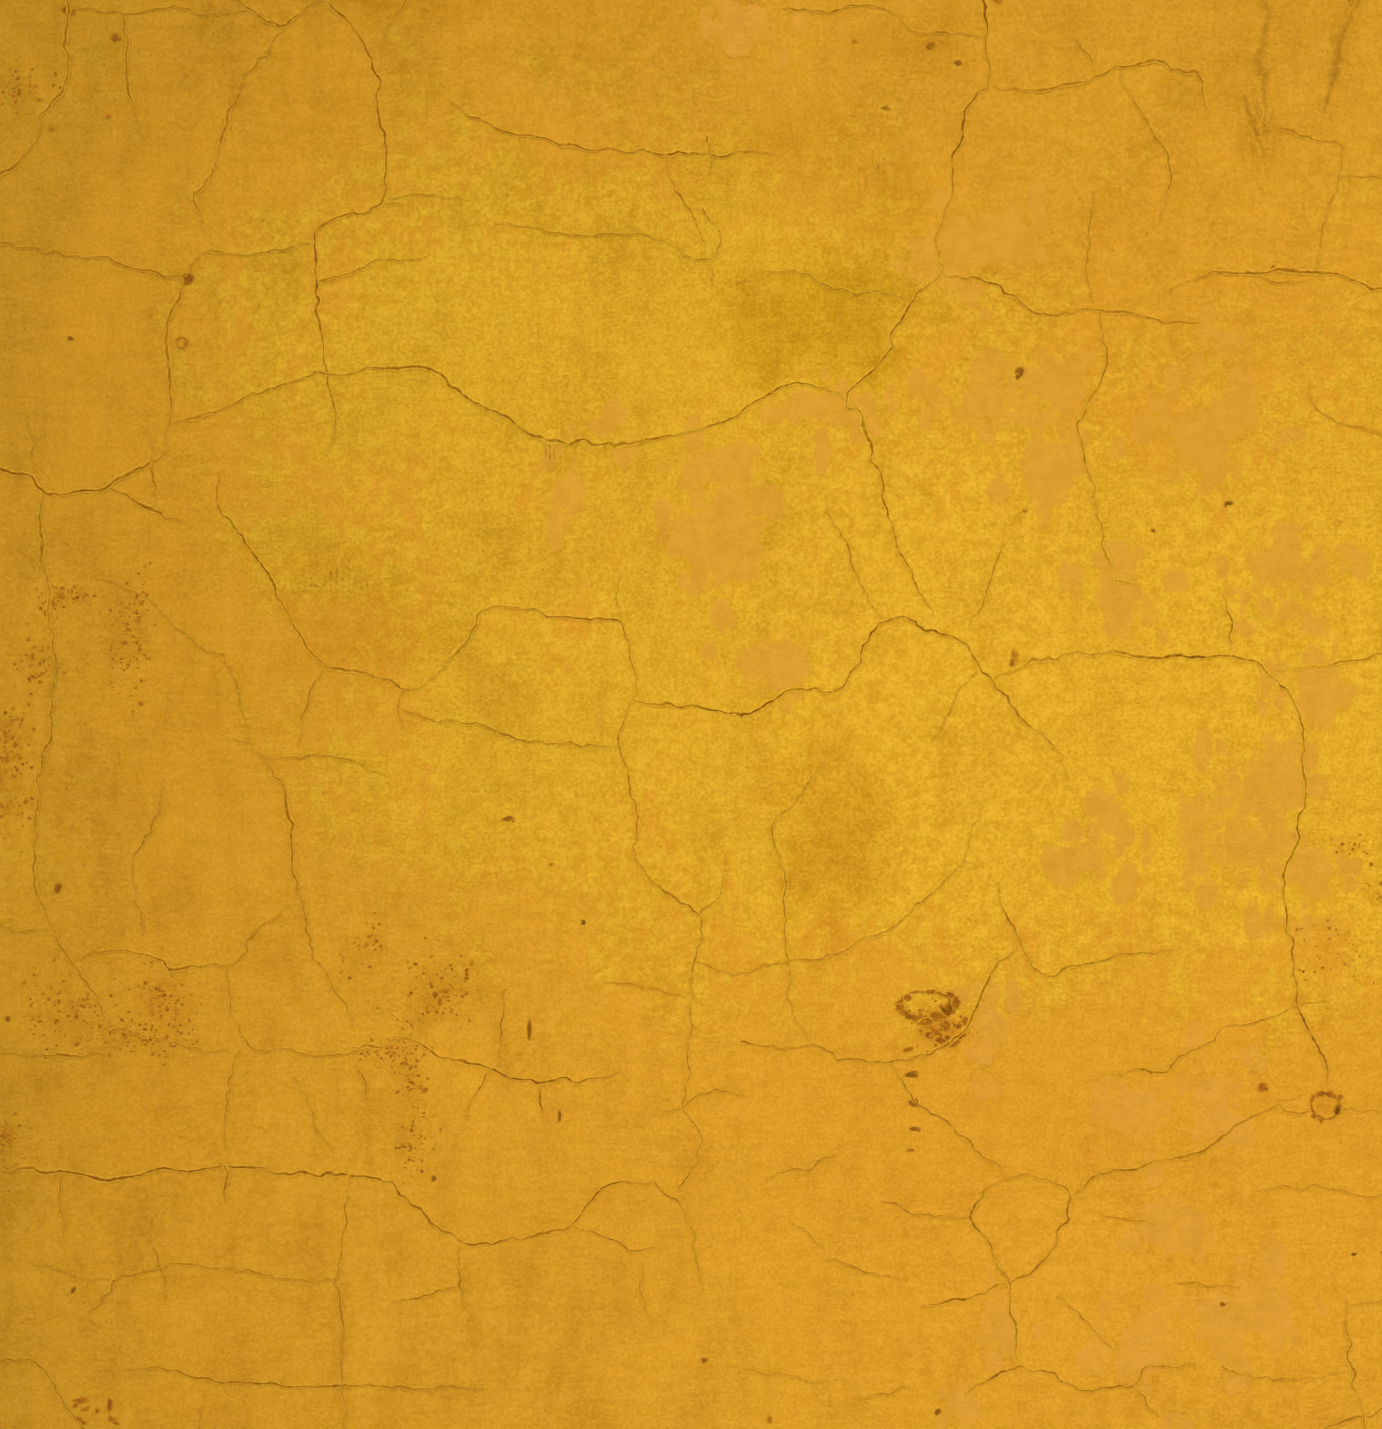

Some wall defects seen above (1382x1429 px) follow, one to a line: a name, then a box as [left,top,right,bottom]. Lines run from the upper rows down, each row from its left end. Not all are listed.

crack [1170,126,1382,292]
crack [1308,375,1382,436]
crack [0,0,1211,1153]
crack [0,471,1382,1429]
rust [893,989,979,1058]
rust [1306,1088,1344,1123]